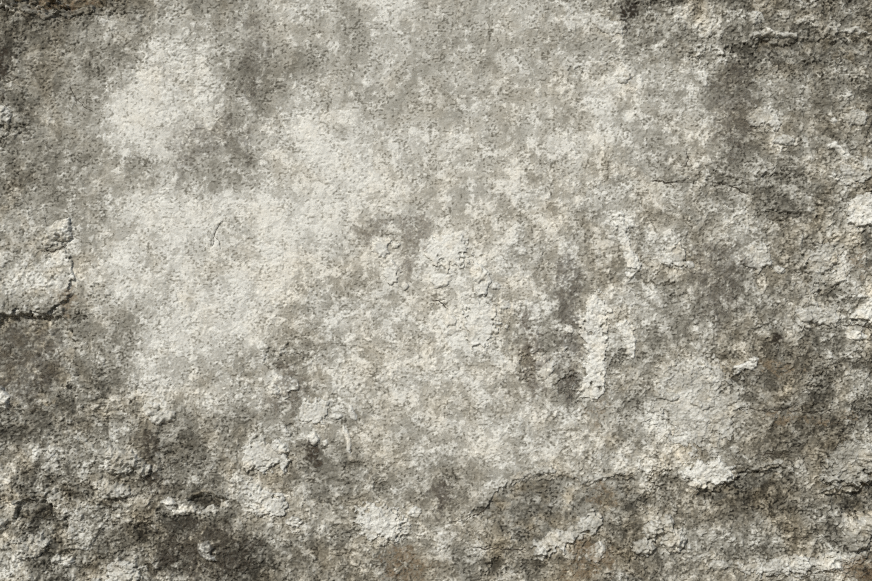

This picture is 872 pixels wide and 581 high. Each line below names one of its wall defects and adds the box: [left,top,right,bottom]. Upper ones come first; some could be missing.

flaking render [0,203,75,412]
spalling [9,493,61,564]
flaking render [91,556,148,581]
spalling [183,487,226,508]
flaking render [197,541,217,562]
flaking render [241,438,303,528]